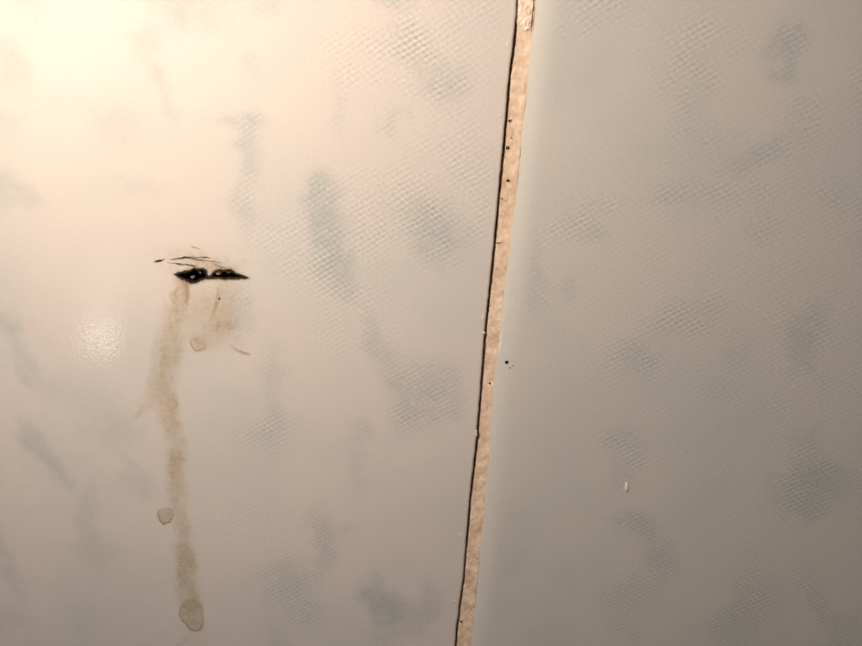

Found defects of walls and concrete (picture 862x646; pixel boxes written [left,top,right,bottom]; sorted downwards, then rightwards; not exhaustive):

spalling [178,269,244,283]